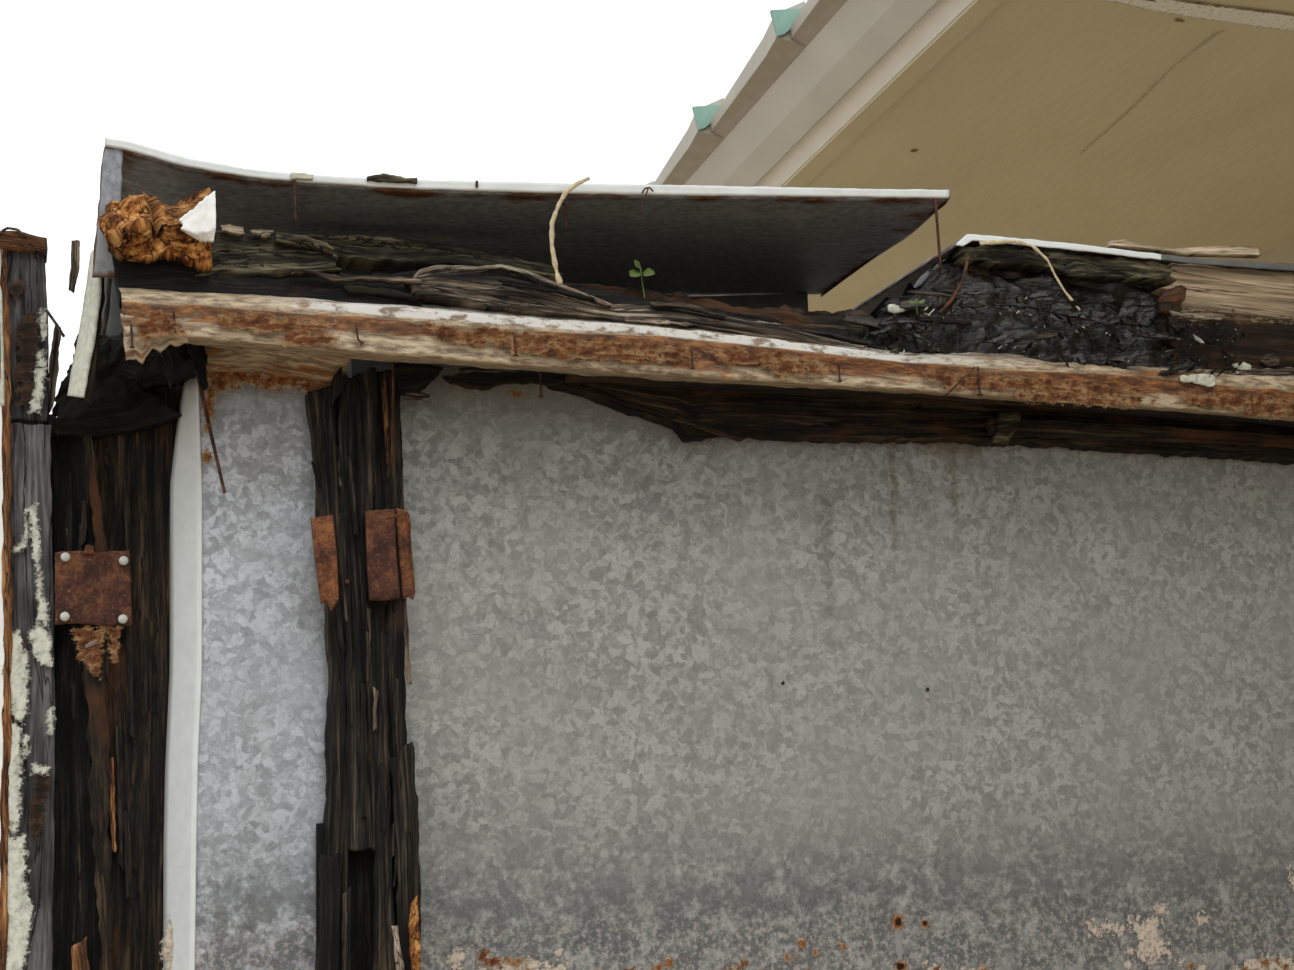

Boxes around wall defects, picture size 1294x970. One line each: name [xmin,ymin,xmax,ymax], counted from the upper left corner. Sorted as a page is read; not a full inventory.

crack [1146,0,1294,23]
rust [132,310,194,346]
rust [217,309,340,347]
rust [423,320,838,380]
rust [200,371,327,464]
rust [921,368,1157,410]
rust [1180,391,1294,420]
rust [71,625,122,680]
leakage [29,772,51,840]
rust [921,954,986,970]